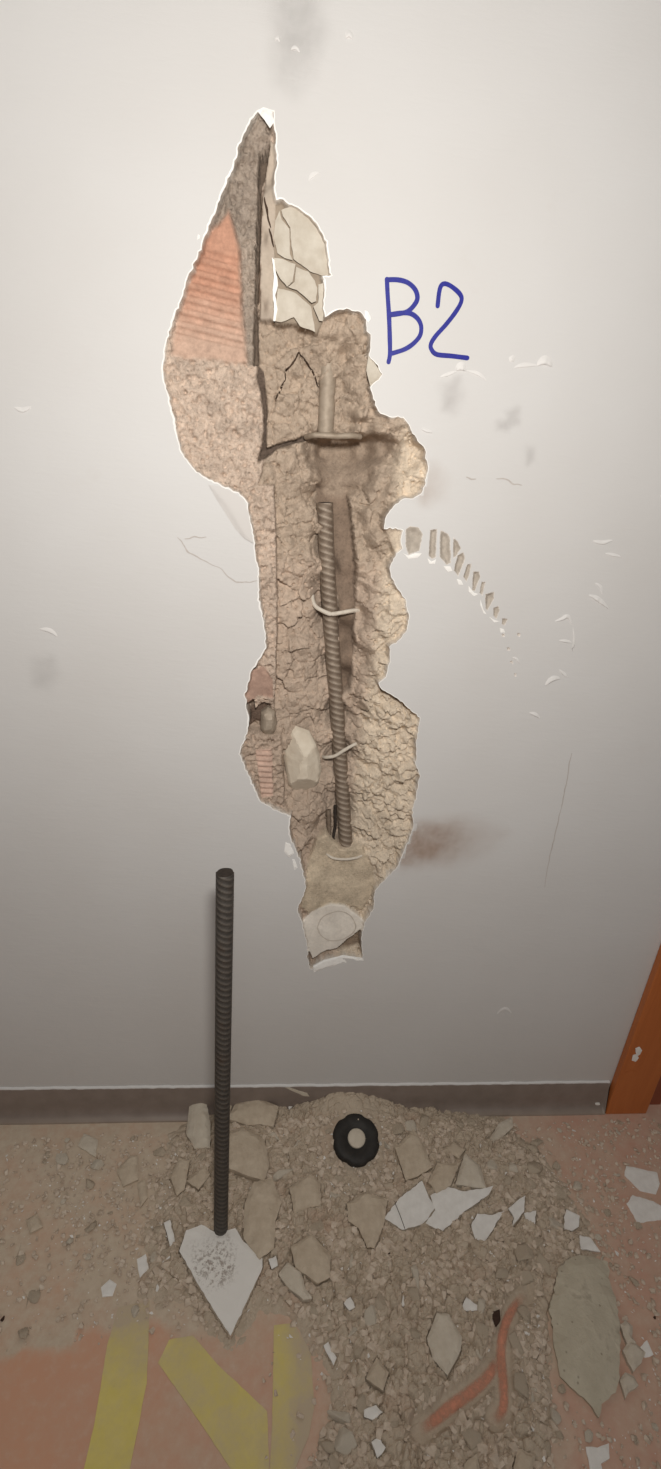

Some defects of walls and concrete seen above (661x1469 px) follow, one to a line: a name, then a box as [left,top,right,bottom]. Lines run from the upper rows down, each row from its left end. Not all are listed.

spalling [161,107,521,972]